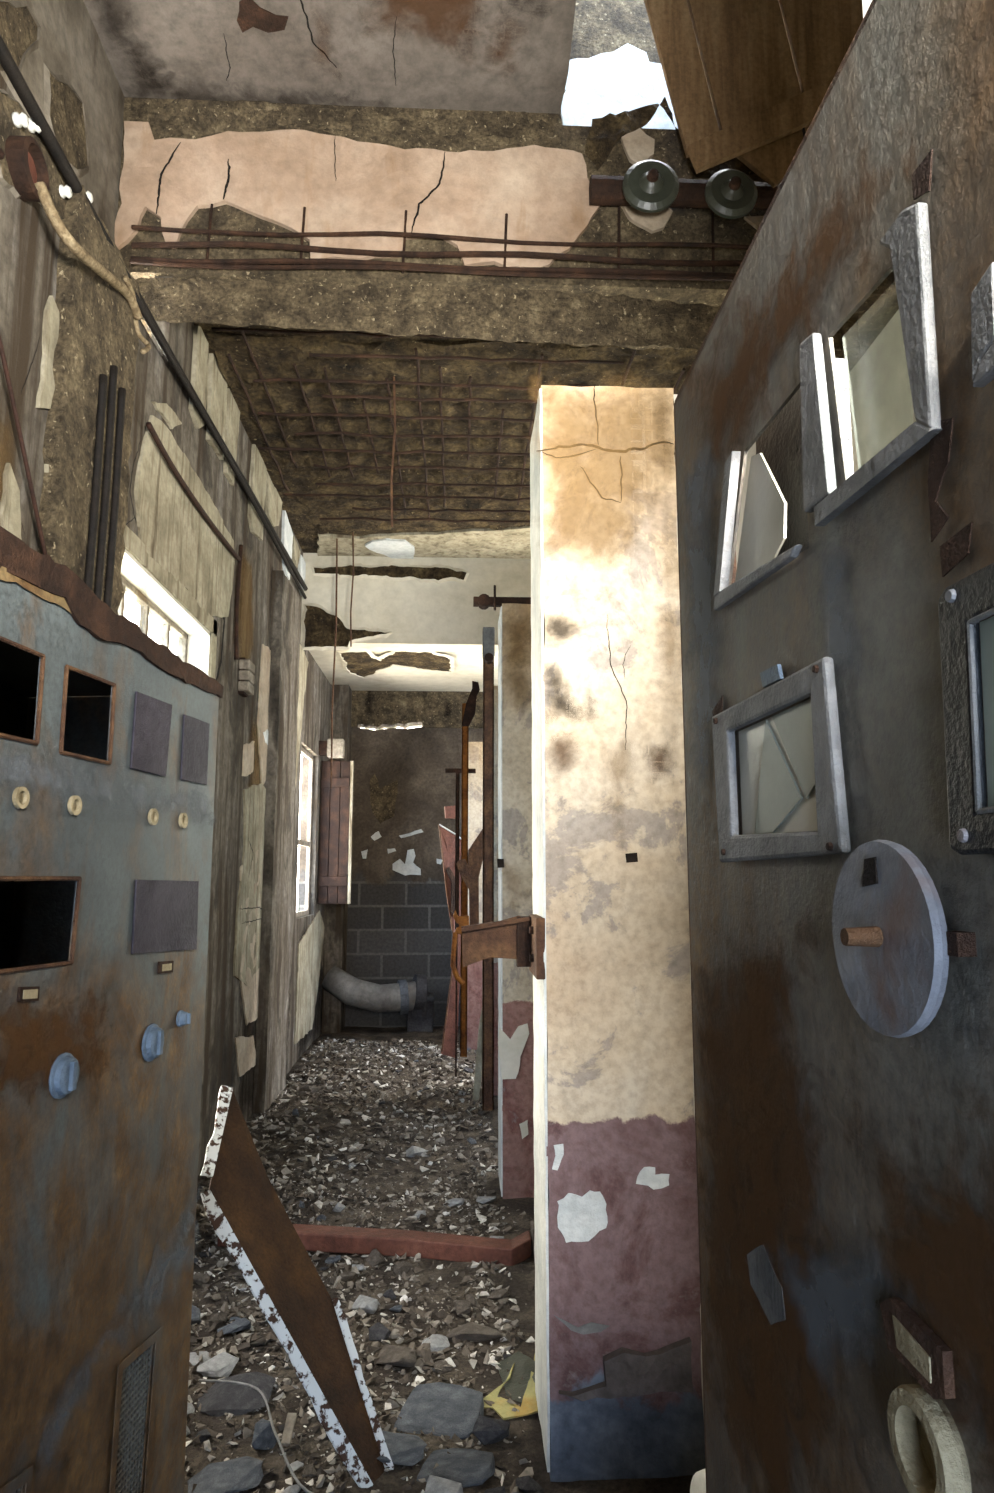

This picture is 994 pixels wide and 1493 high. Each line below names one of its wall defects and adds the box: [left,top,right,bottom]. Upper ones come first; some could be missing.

crack [223,33,231,81]
peeling [237,0,288,33]
crack [300,0,337,68]
crack [390,16,398,84]
spalling [833,313,860,351]
spalling [114,43,755,786]
crack [538,385,597,456]
crack [631,387,676,466]
peeling [361,829,442,875]
peeling [498,1023,529,1079]
peeling [636,1167,669,1190]
peeling [557,1190,608,1243]